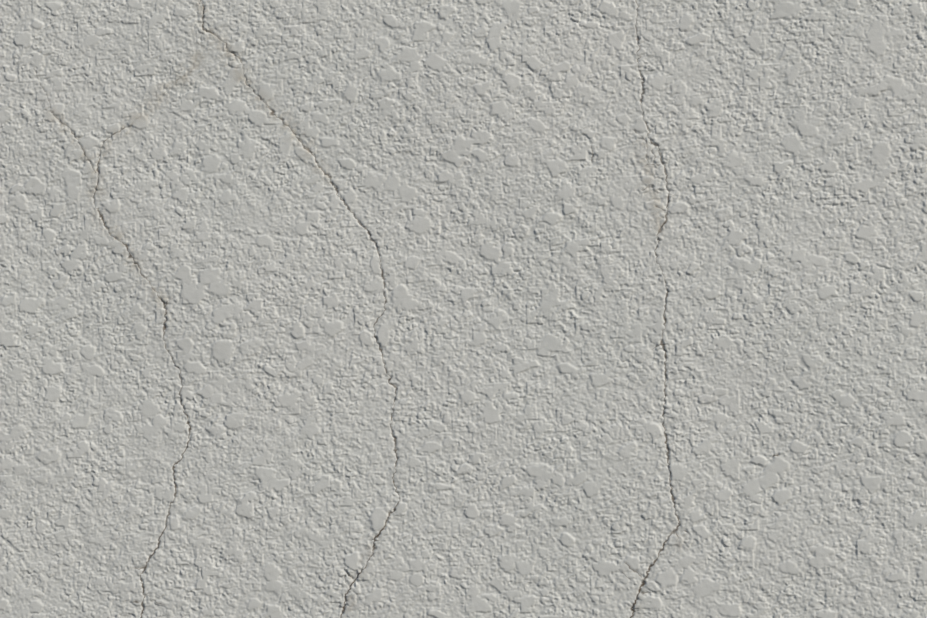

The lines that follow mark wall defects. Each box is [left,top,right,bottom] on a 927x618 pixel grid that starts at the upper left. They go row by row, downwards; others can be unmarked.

crack [94,193,191,617]
crack [315,160,400,616]
crack [626,176,680,618]